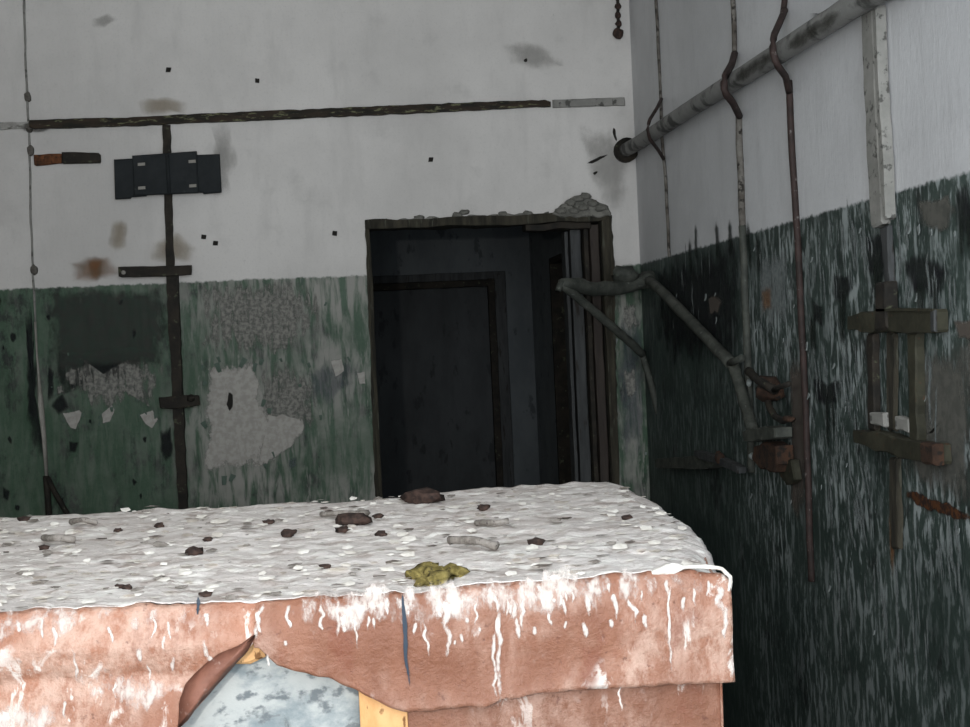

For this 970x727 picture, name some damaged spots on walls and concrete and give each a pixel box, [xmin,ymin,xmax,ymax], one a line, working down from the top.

corrosion [81,261,105,276]
flaking render [545,193,615,281]
peeling [691,291,721,324]
peeling [0,229,427,608]
peeling [419,463,702,576]
corrosion [907,492,970,519]